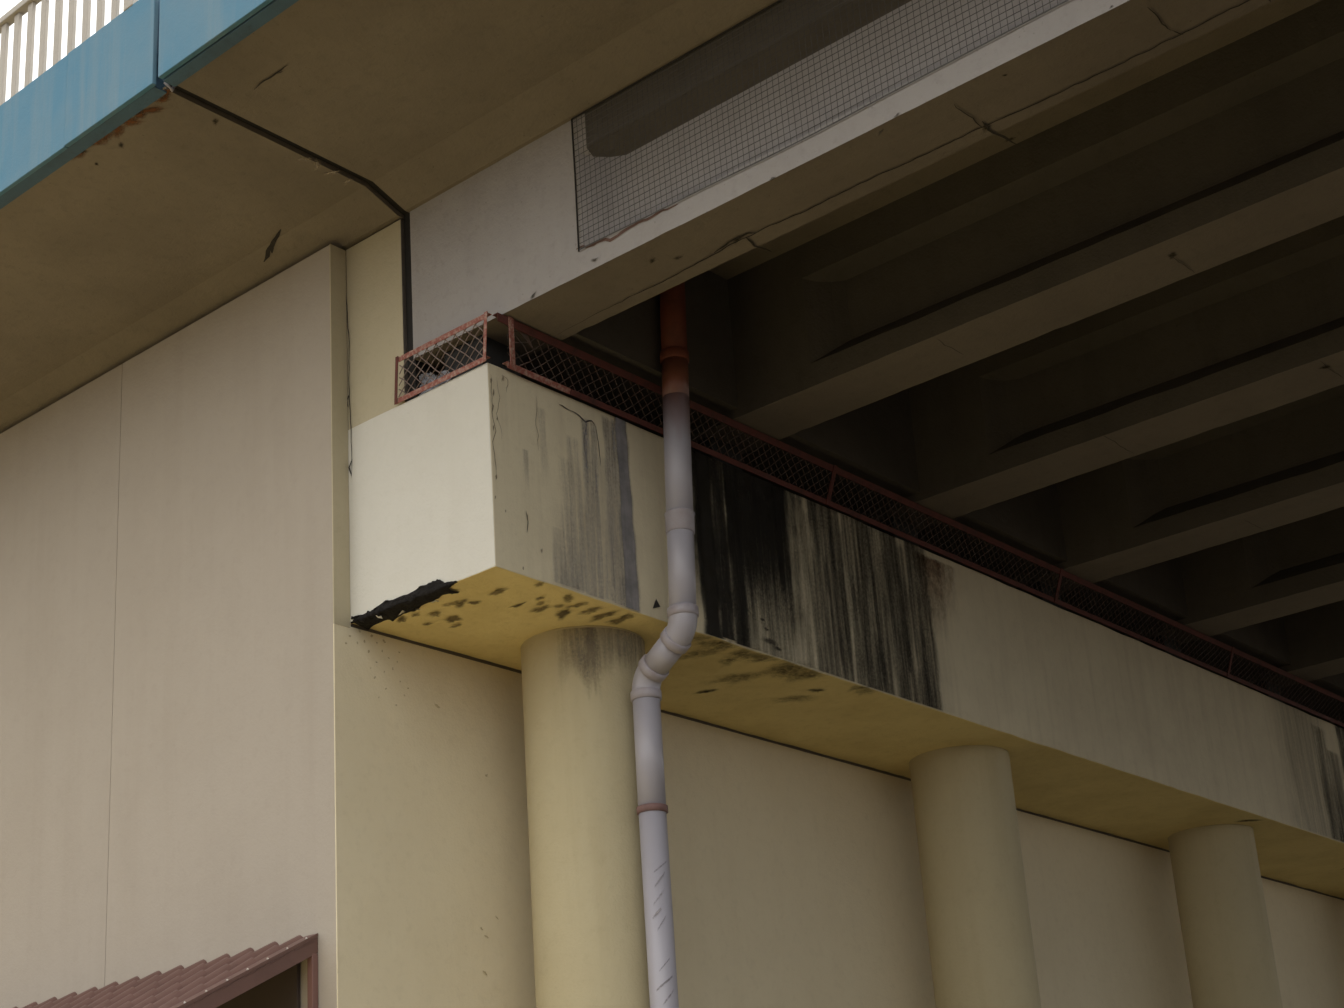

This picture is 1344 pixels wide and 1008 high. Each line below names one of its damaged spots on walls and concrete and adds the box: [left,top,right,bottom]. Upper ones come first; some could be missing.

crack [559,0,1271,334]
spalling [345,579,504,706]
peeling [512,583,632,624]
damp [583,417,640,611]
damp [691,450,941,710]